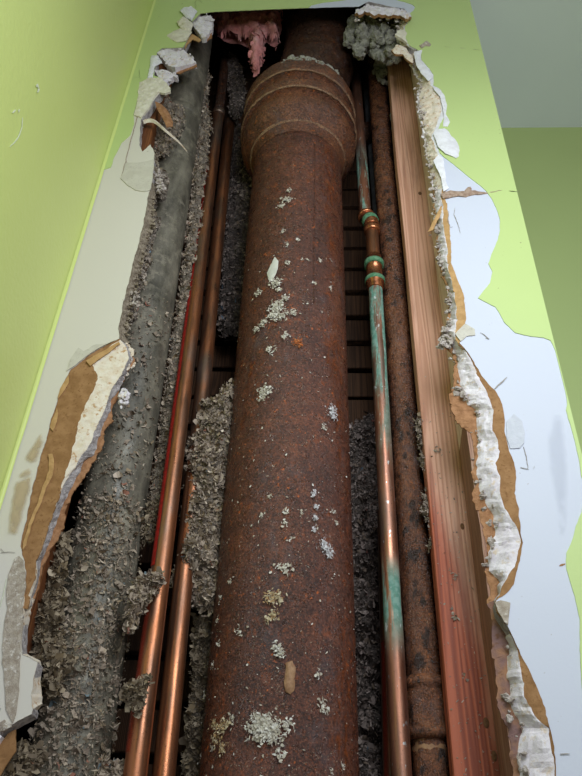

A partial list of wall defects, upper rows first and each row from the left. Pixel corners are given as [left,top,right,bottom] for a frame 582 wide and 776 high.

peeling [0,6,287,776]
peeling [309,0,582,776]